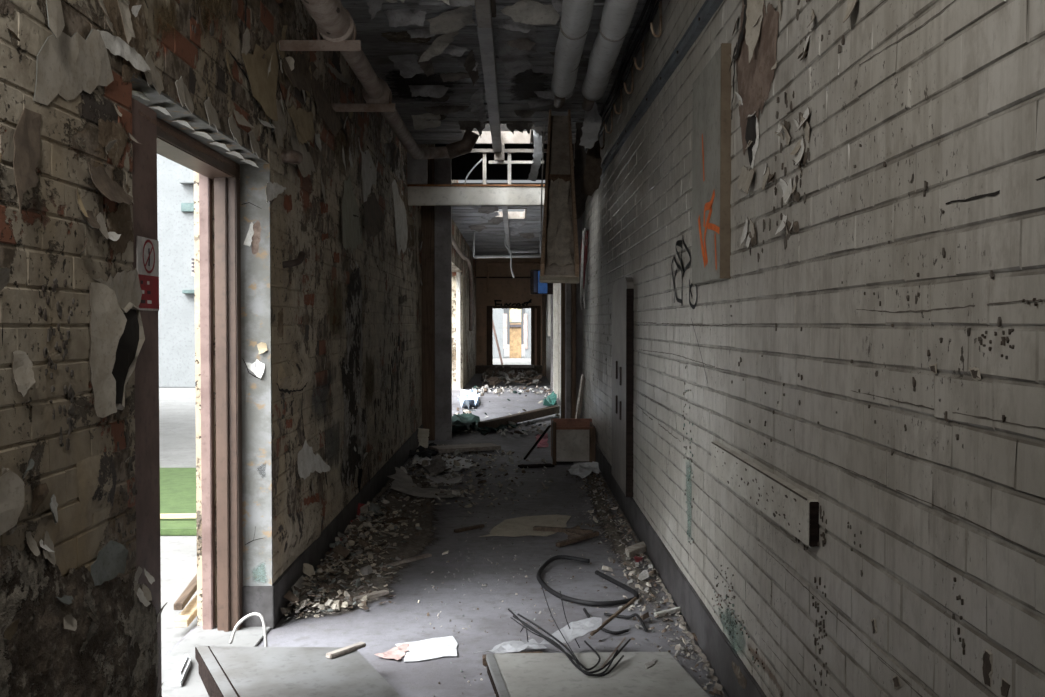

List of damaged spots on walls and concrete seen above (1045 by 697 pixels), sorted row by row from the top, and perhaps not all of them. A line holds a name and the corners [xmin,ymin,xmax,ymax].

peeling [33,0,322,177]
peeling [244,220,262,254]
peeling [265,182,292,214]
peeling [367,0,487,138]
peeling [506,110,534,134]
peeling [496,0,563,33]
peeling [729,0,810,262]
spalling [12,278,75,450]
peeling [246,342,267,378]
peeling [297,137,412,506]
peeling [0,459,168,697]